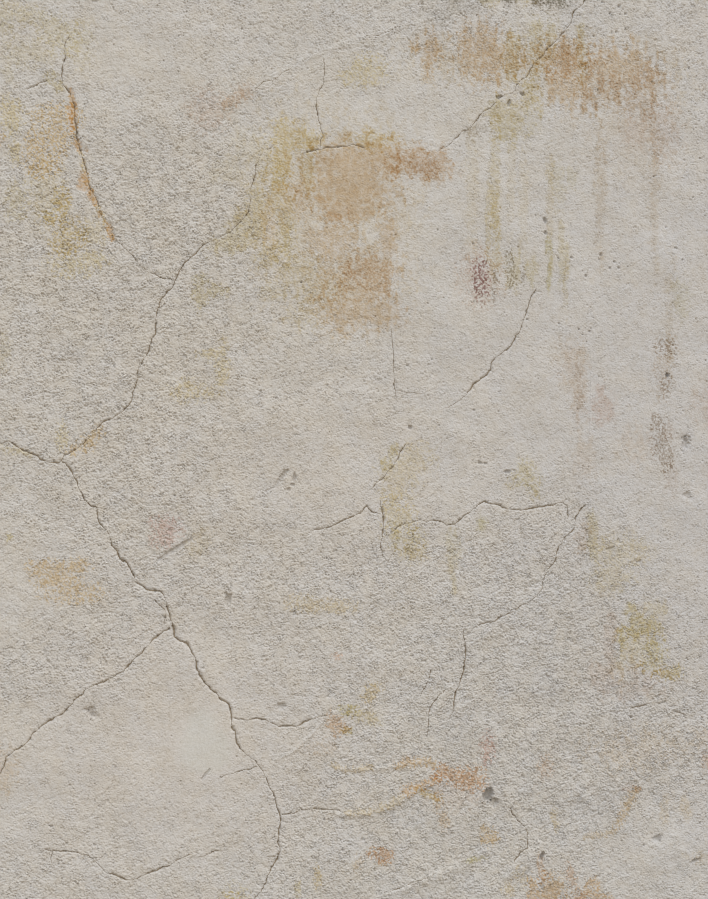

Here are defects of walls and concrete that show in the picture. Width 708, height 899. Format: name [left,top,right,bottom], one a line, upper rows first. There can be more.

corrosion [0,100,110,278]
crack [300,60,363,155]
crack [441,0,585,149]
crack [448,290,536,408]
crack [0,35,340,897]
crack [314,444,585,734]